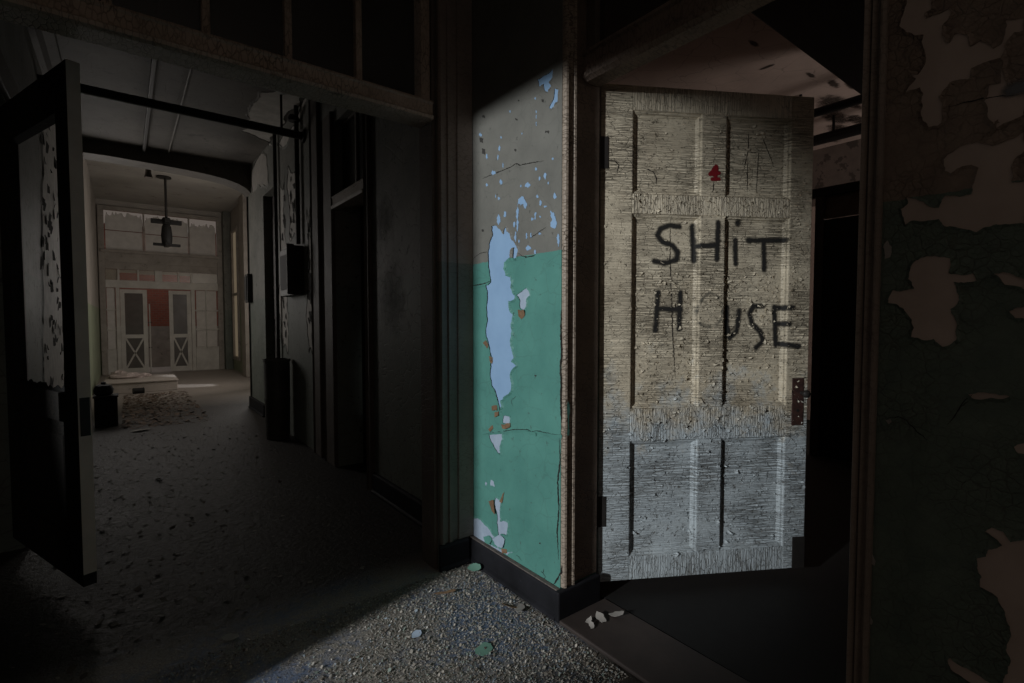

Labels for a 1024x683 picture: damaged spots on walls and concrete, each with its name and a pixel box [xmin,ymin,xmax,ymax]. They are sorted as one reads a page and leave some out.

crack [482,161,544,182]
peeling [534,68,559,134]
peeling [896,0,1024,236]
peeling [40,124,65,388]
peeling [479,133,560,456]
peeling [885,253,982,350]
peeling [473,480,512,555]
crack [482,321,562,584]
peeling [943,523,1024,683]